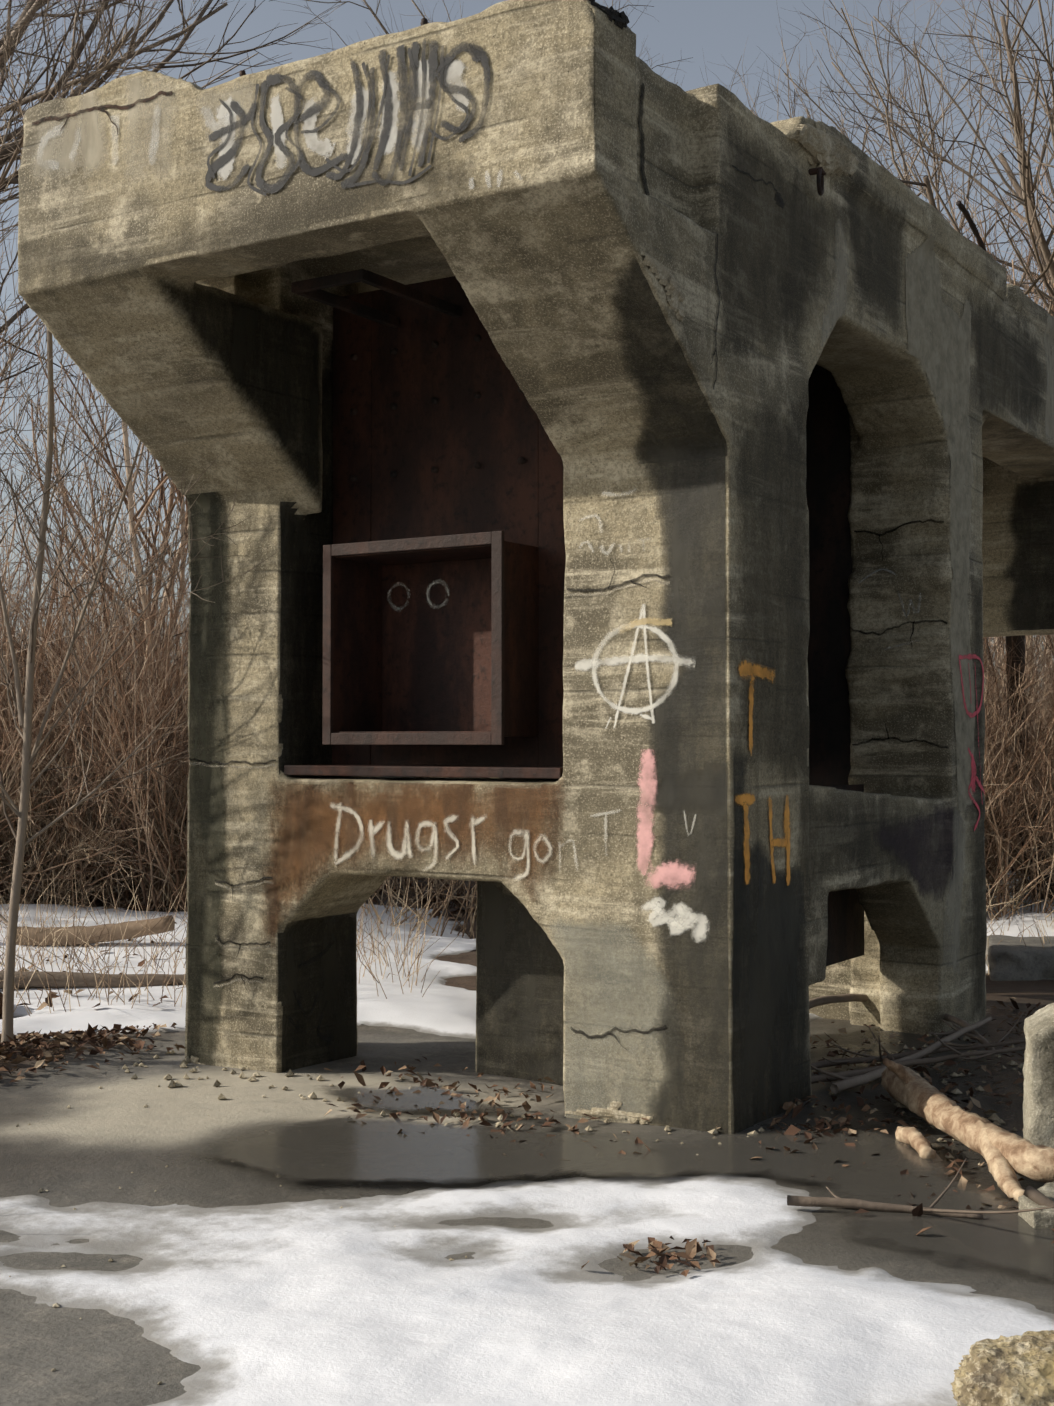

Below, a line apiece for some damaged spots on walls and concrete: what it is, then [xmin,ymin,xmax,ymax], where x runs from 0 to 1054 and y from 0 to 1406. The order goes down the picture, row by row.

crack [32,91,172,134]
crack [638,83,650,195]
water stain [724,143,821,340]
water stain [823,177,905,341]
water stain [971,305,1054,438]
crack [567,558,670,592]
crack [854,519,944,560]
water stain [614,261,986,1134]
crack [571,1025,667,1050]